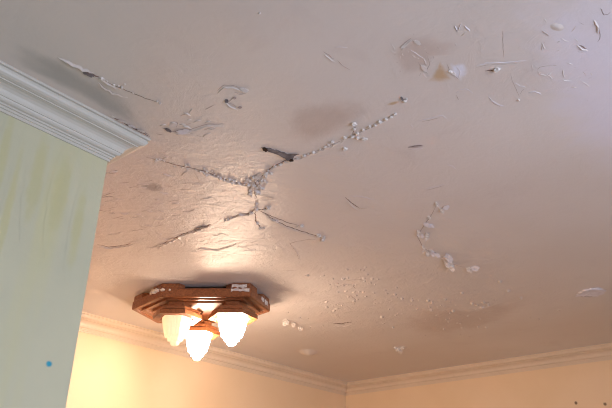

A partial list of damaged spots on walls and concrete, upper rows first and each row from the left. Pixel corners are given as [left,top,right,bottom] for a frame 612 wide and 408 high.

leakage [0,32,153,134]
crack [57,57,161,104]
peeling [455,0,612,196]
crack [98,113,397,259]